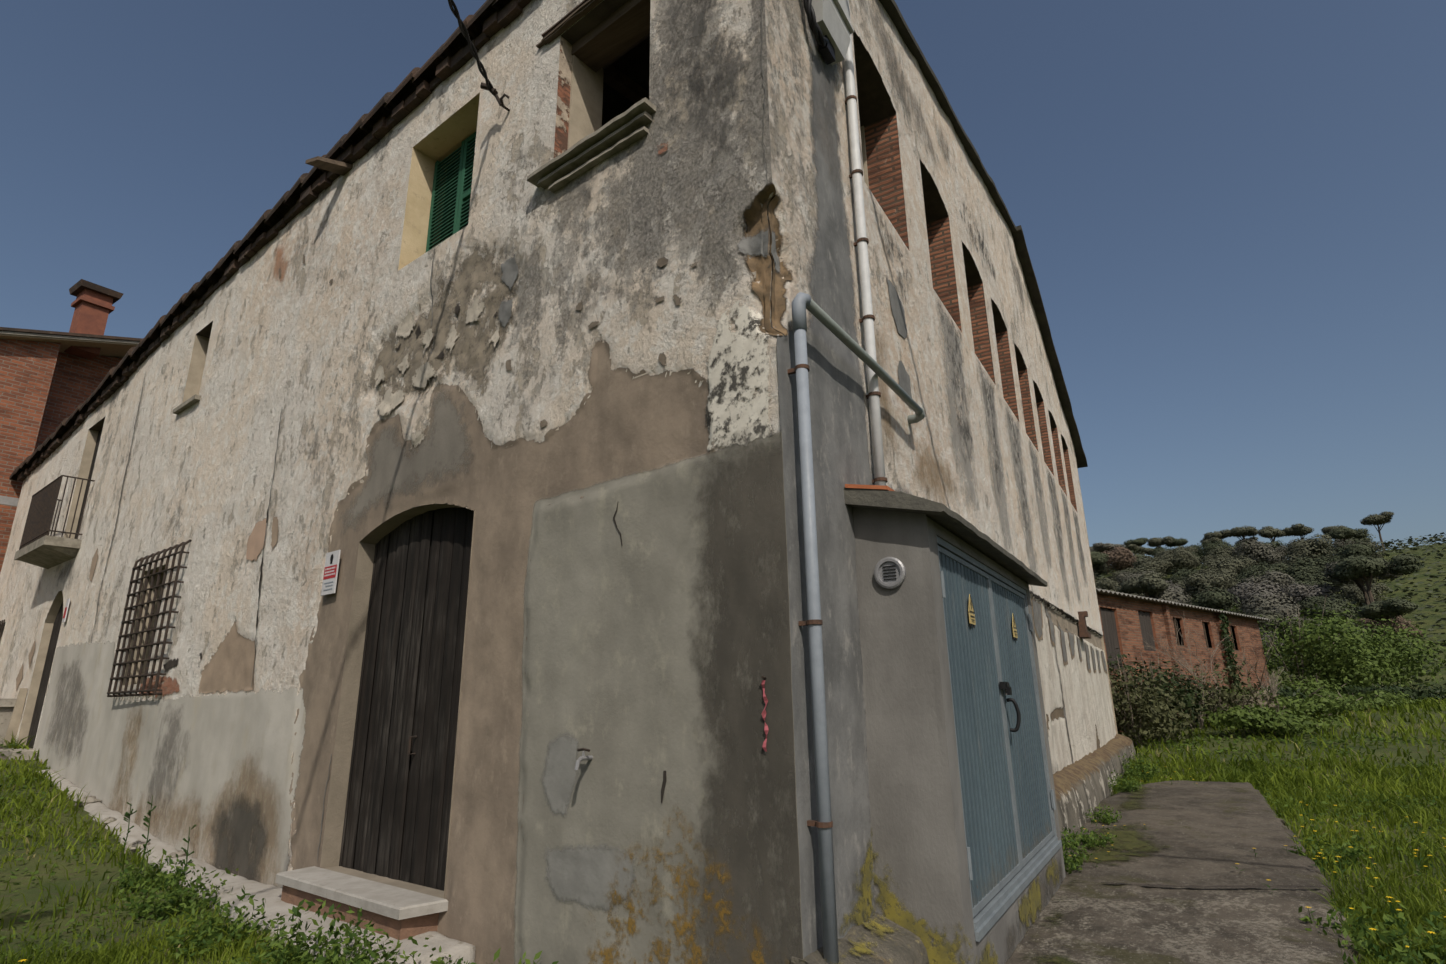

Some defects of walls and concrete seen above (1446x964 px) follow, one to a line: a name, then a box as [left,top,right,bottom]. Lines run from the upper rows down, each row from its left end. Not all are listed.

damp [984,386,1084,567]
peeling [289,182,793,964]
flaking render [139,658,180,698]
peeling [197,618,256,694]
peeling [1031,597,1107,673]
spalling [1046,707,1065,736]
damp [116,721,275,881]